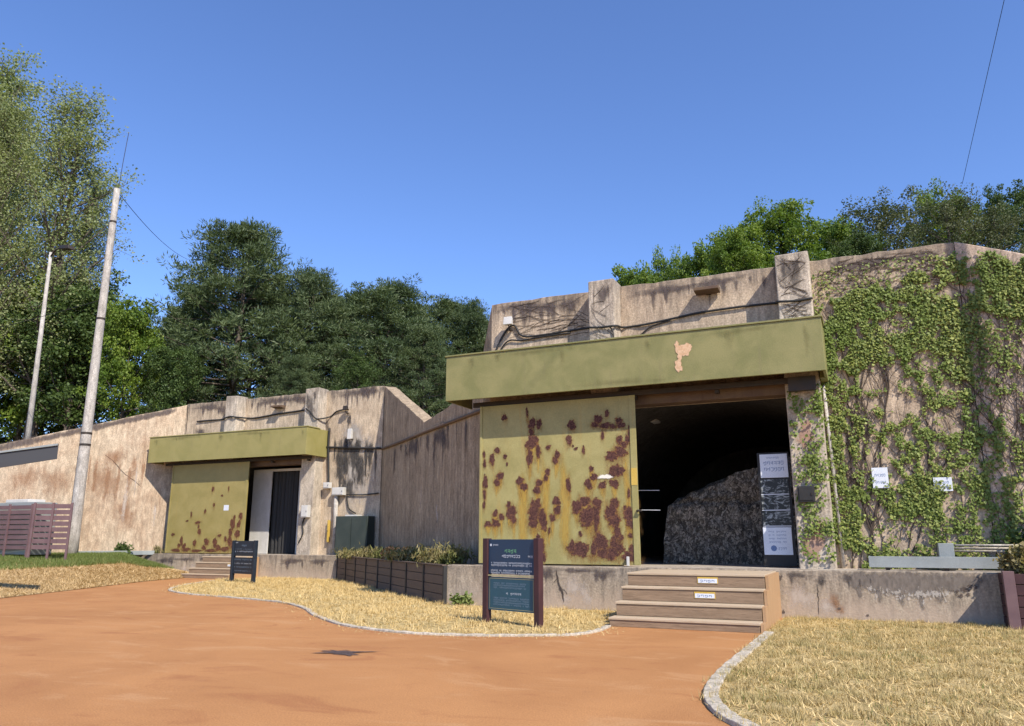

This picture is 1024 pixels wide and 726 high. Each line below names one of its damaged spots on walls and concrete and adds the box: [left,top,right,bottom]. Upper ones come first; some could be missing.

damp [782,262,798,284]
damp [593,286,609,301]
damp [636,278,737,305]
damp [503,299,579,324]
peeling [674,340,692,373]
rust [482,407,641,562]
rust [171,486,243,552]